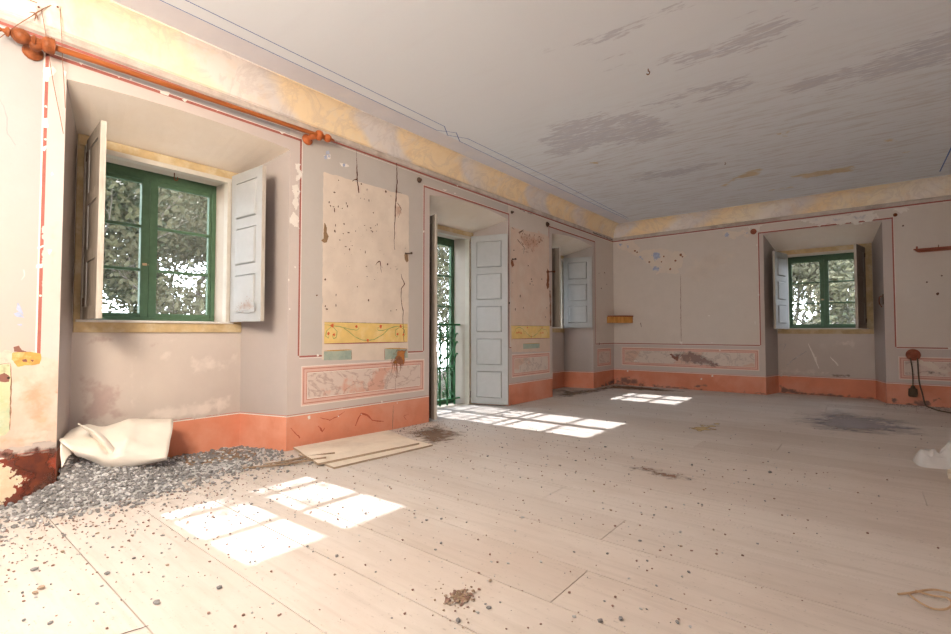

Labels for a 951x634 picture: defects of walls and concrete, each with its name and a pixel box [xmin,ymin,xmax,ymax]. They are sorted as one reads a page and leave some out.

crack [376,163,405,337]
flaking render [0,346,59,505]
rust [391,350,406,390]